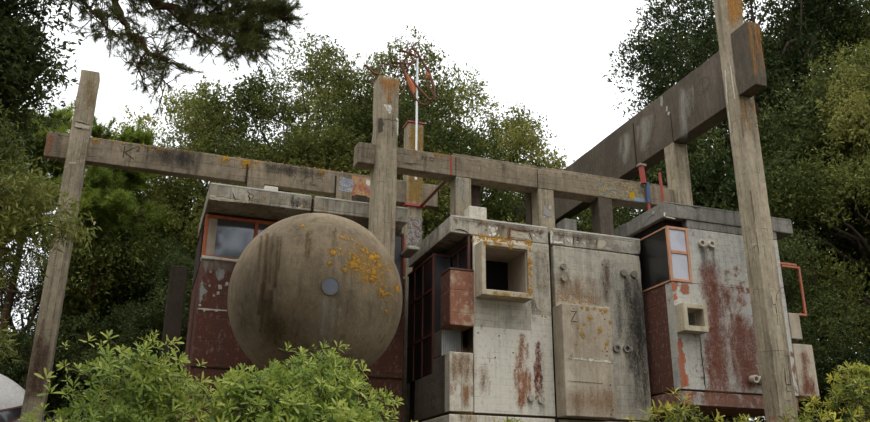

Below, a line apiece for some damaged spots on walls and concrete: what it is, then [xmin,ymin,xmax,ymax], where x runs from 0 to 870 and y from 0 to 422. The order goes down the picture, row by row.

rust [514,335,543,407]
water stain [619,283,647,395]
rust [700,267,758,391]